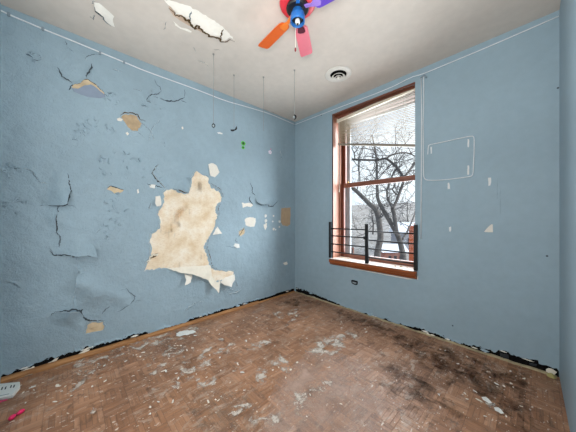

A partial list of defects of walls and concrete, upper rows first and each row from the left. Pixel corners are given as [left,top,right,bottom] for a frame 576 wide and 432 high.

peeling [92,1,115,27]
peeling [164,0,233,42]
peeling [57,50,107,98]
crack [137,81,186,103]
peeling [117,112,143,135]
crack [39,207,83,246]
flaking render [143,163,235,293]
peeling [264,207,292,230]
crack [49,309,103,334]
flaking render [1,286,559,377]